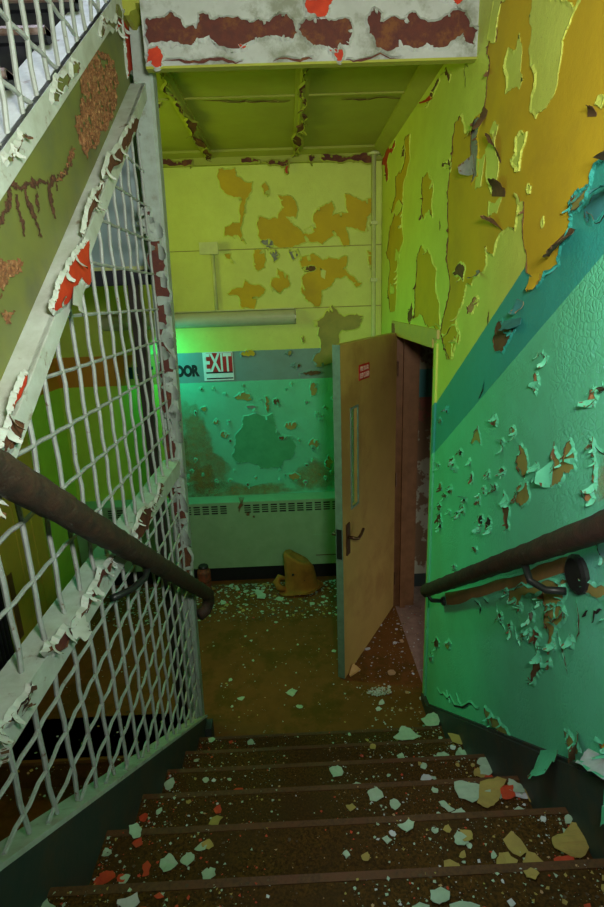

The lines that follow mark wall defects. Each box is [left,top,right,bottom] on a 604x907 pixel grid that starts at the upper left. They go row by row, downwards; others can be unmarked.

peeling [98,4,133,79]
peeling [143,0,355,72]
peeling [365,0,604,362]
peeling [48,237,92,316]
peeling [216,167,371,405]
peeling [132,205,233,576]
peeling [434,424,599,535]
peeling [40,553,118,658]
peeling [445,552,604,688]
peeling [418,727,604,814]
peeling [142,839,214,877]
peeling [431,824,473,867]